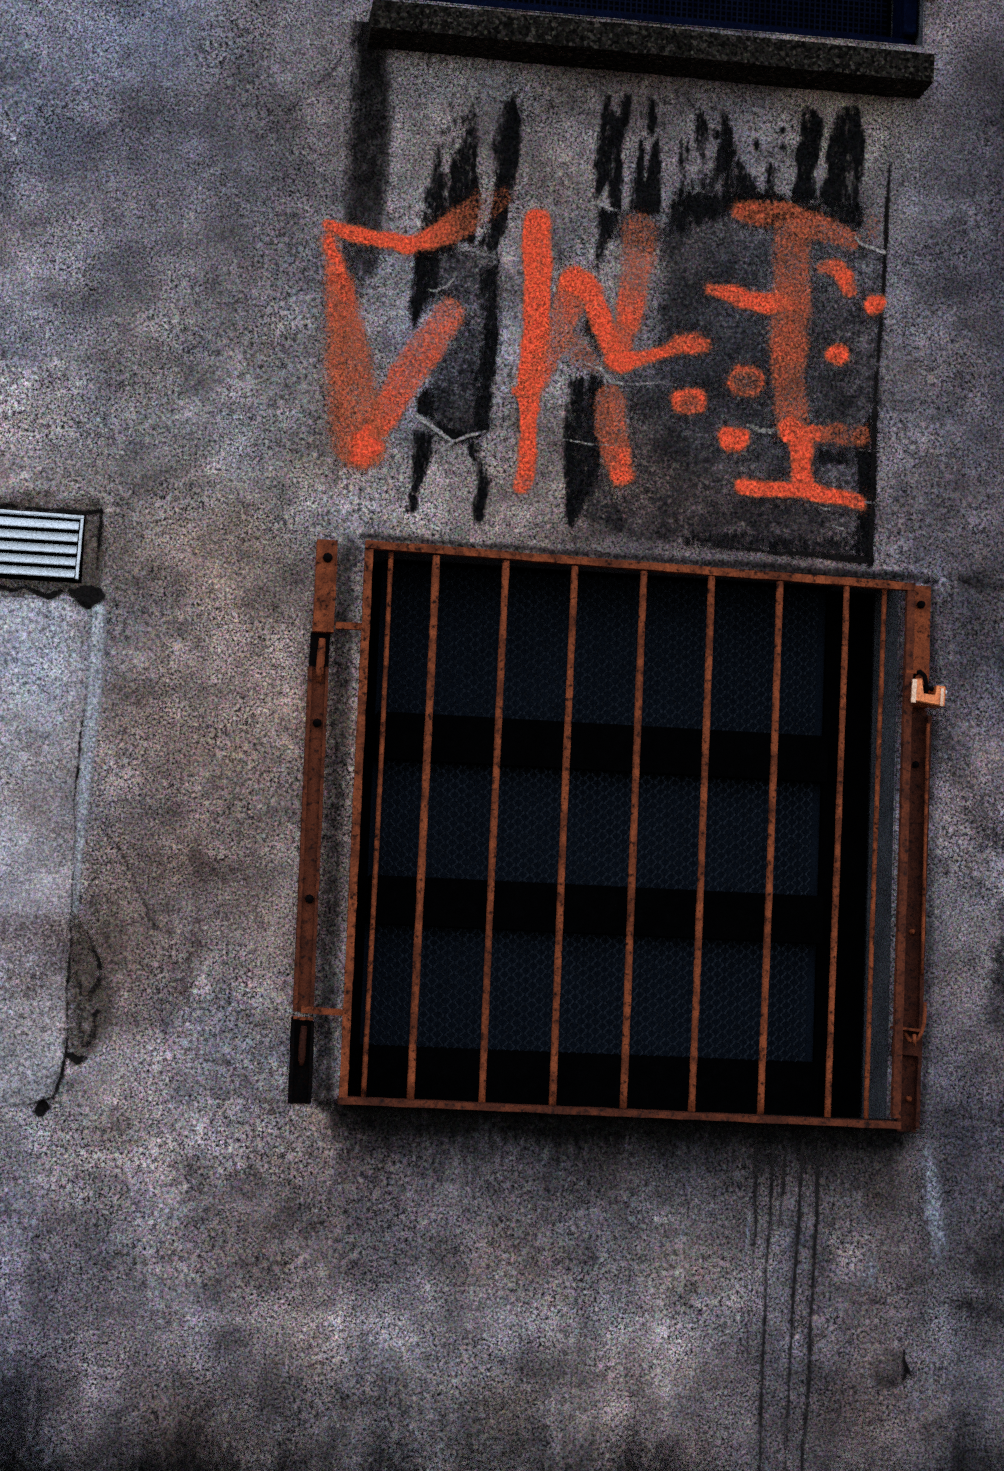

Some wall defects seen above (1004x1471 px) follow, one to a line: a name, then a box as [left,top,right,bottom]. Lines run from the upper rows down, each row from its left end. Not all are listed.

water stain [348,532,936,595]
crack [18,699,159,1105]
water stain [312,561,909,1471]
water stain [923,1143,945,1261]
water stain [119,1430,219,1471]